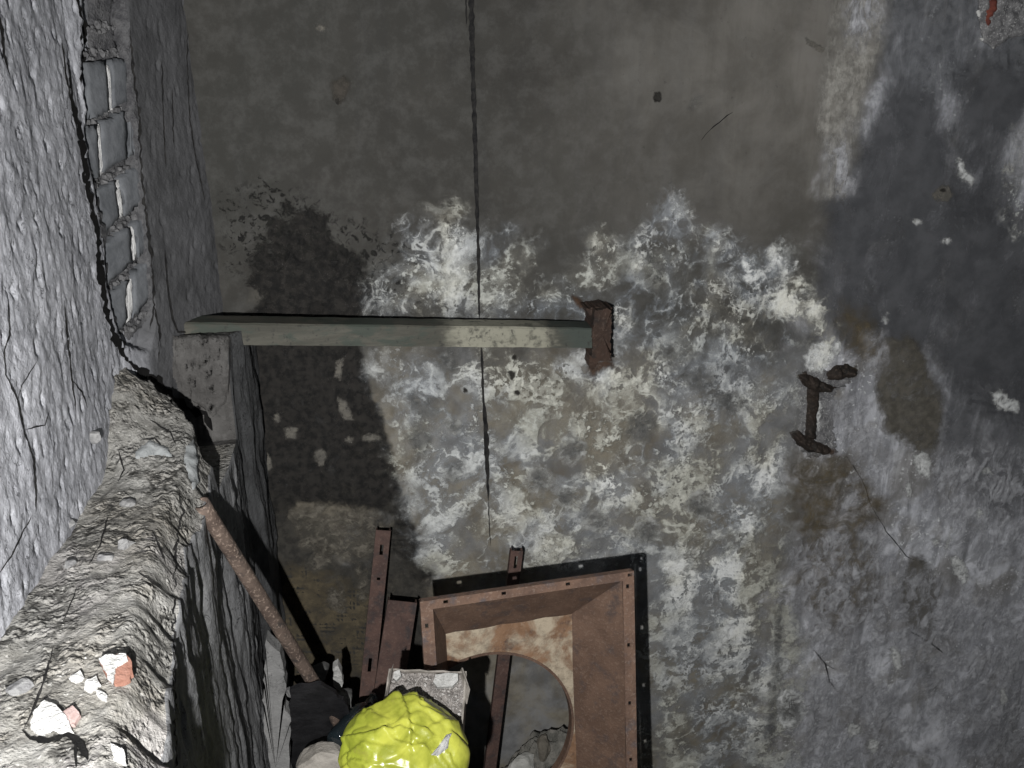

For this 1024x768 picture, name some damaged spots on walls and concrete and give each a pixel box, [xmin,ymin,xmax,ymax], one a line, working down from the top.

crack [465,0,481,318]
crack [62,0,231,458]
rust [589,361,613,375]
damp [219,0,1024,768]
crack [0,302,50,572]
crack [88,517,108,565]
spalling [135,440,199,490]
crack [481,347,491,542]
crack [846,456,911,559]
peeling [69,670,108,702]
peeling [110,743,127,766]